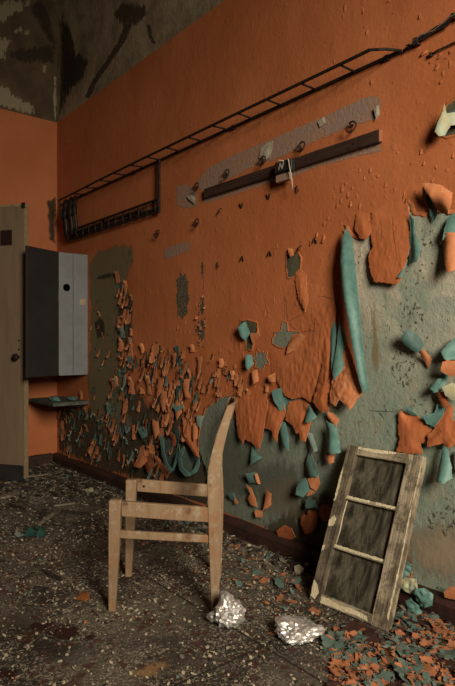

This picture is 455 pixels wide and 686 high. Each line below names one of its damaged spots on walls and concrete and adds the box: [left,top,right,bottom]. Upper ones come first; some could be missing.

leakage [11,2,88,114]
leakage [86,3,156,98]
peeling [433,97,455,139]
peeling [57,183,455,600]